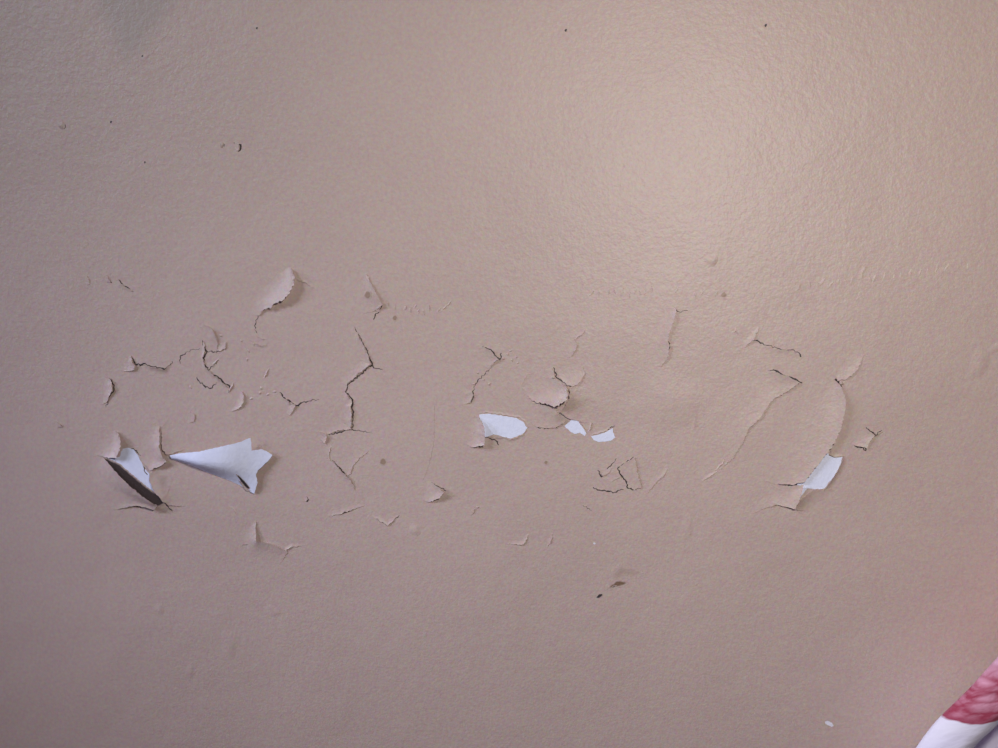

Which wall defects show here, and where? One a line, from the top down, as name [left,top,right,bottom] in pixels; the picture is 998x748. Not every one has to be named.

peeling [248,267,318,349]
peeling [90,418,272,511]
crack [116,325,399,526]
peeling [467,363,618,447]
peeling [752,353,864,514]
peeling [852,427,883,451]